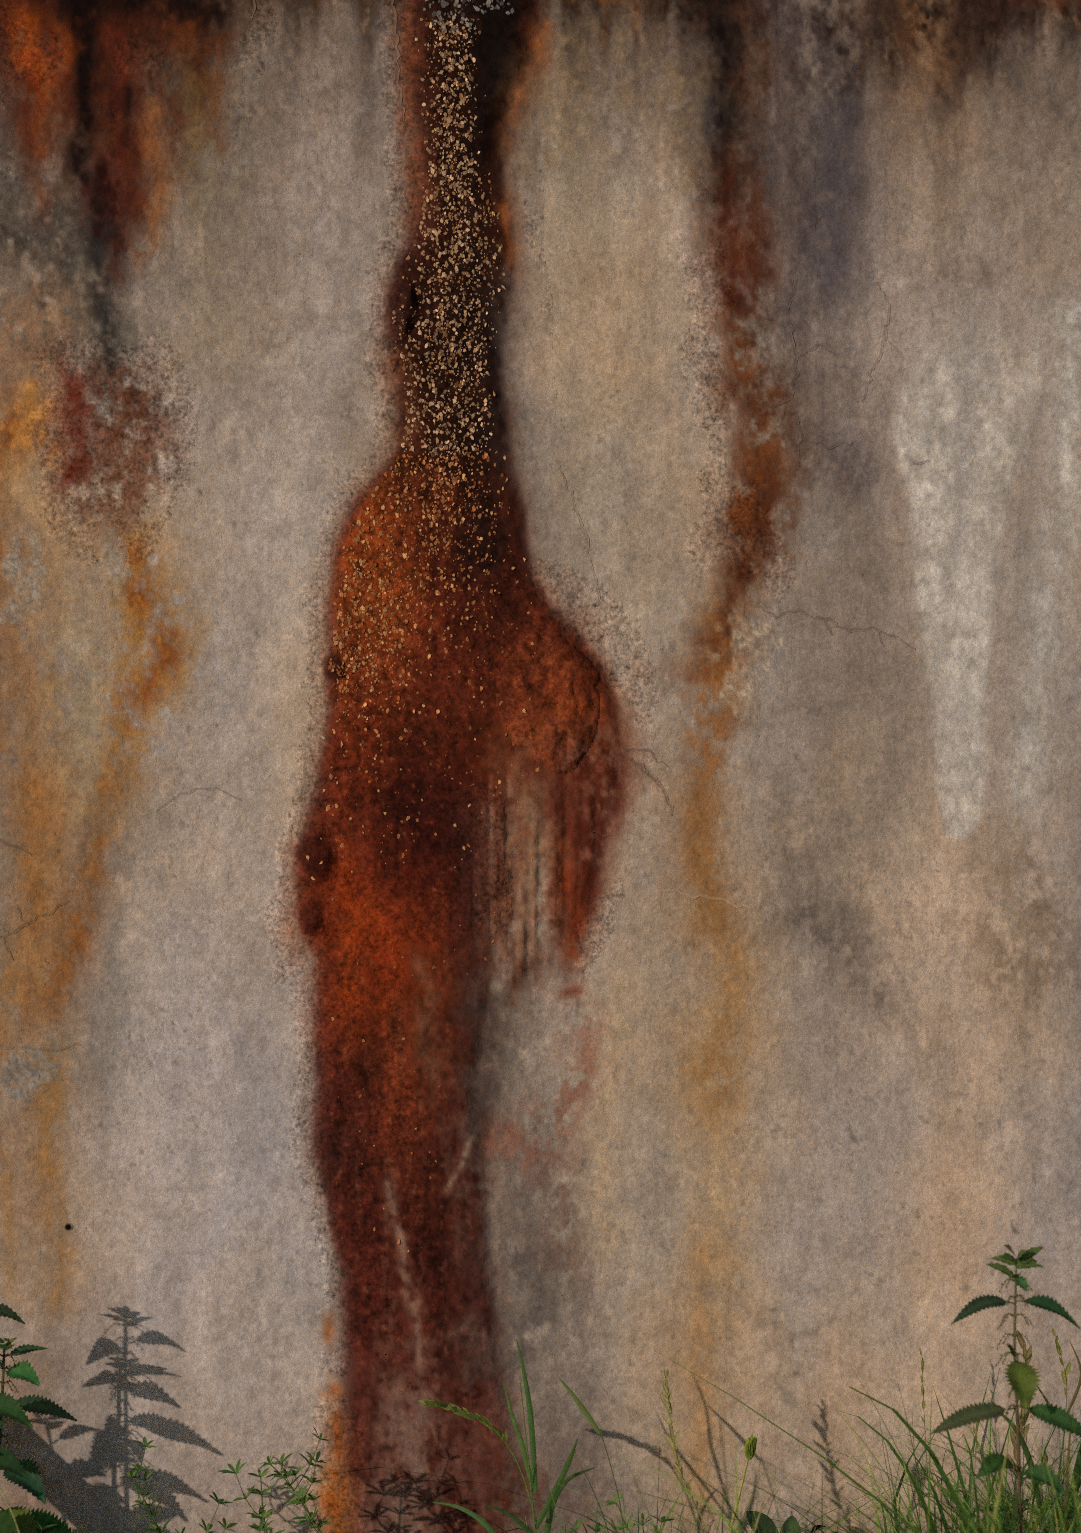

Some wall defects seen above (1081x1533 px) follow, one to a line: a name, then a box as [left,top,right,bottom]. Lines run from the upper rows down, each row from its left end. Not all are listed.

rust [0,1084,98,1325]
rust [0,0,278,835]
rust [264,0,820,1533]
damp [457,0,1081,1216]